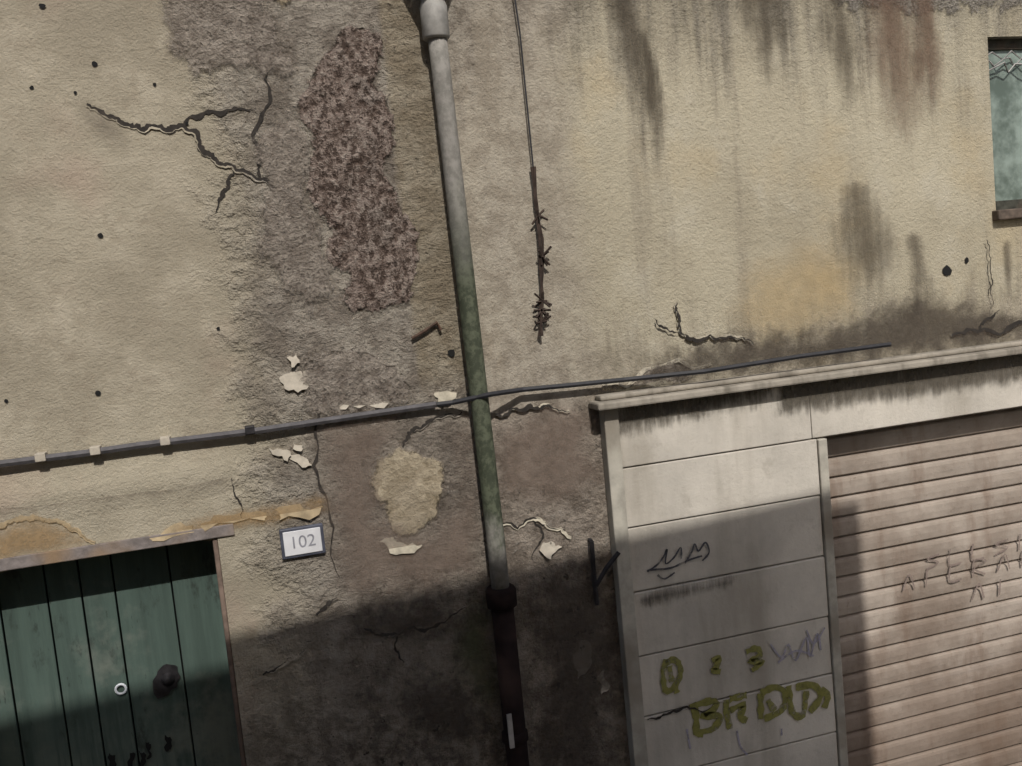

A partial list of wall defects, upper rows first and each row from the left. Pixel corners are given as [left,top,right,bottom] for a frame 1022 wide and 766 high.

crack [86,67,275,212]
flaking render [252,23,420,316]
flaking render [149,504,323,541]
flaking render [269,442,311,468]
flaking render [369,445,447,555]